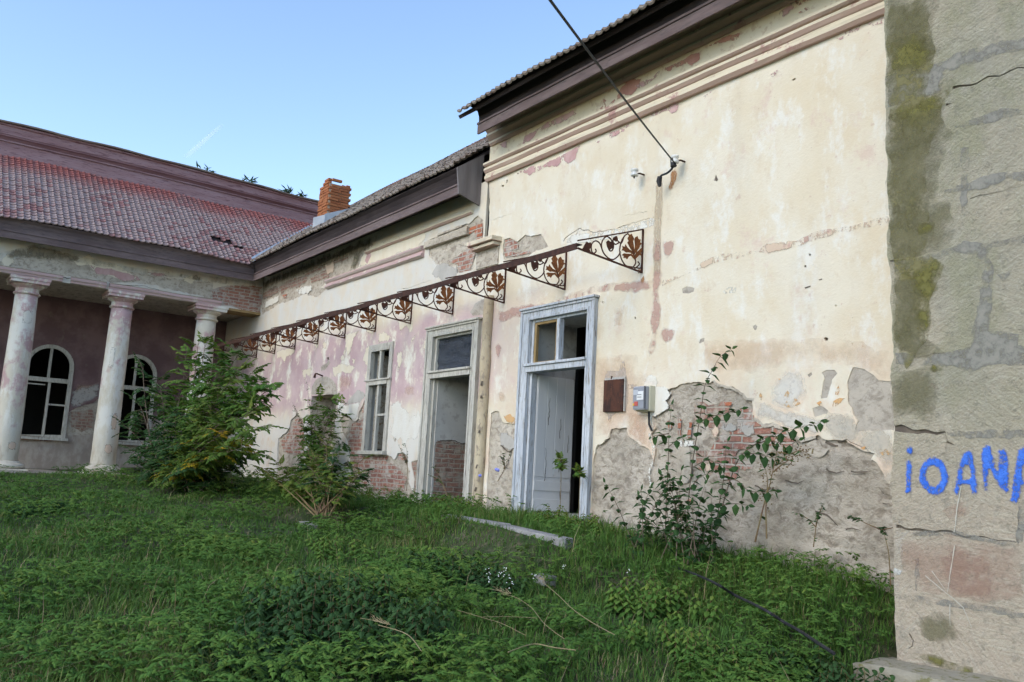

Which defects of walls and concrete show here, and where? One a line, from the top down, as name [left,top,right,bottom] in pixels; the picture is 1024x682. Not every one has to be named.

peeling [600,33,740,109]
peeling [520,146,580,176]
spalling [0,216,484,315]
spalling [504,234,548,261]
spalling [278,415,304,484]
spalling [338,401,420,501]
spalling [432,411,515,511]
spalling [592,367,894,595]